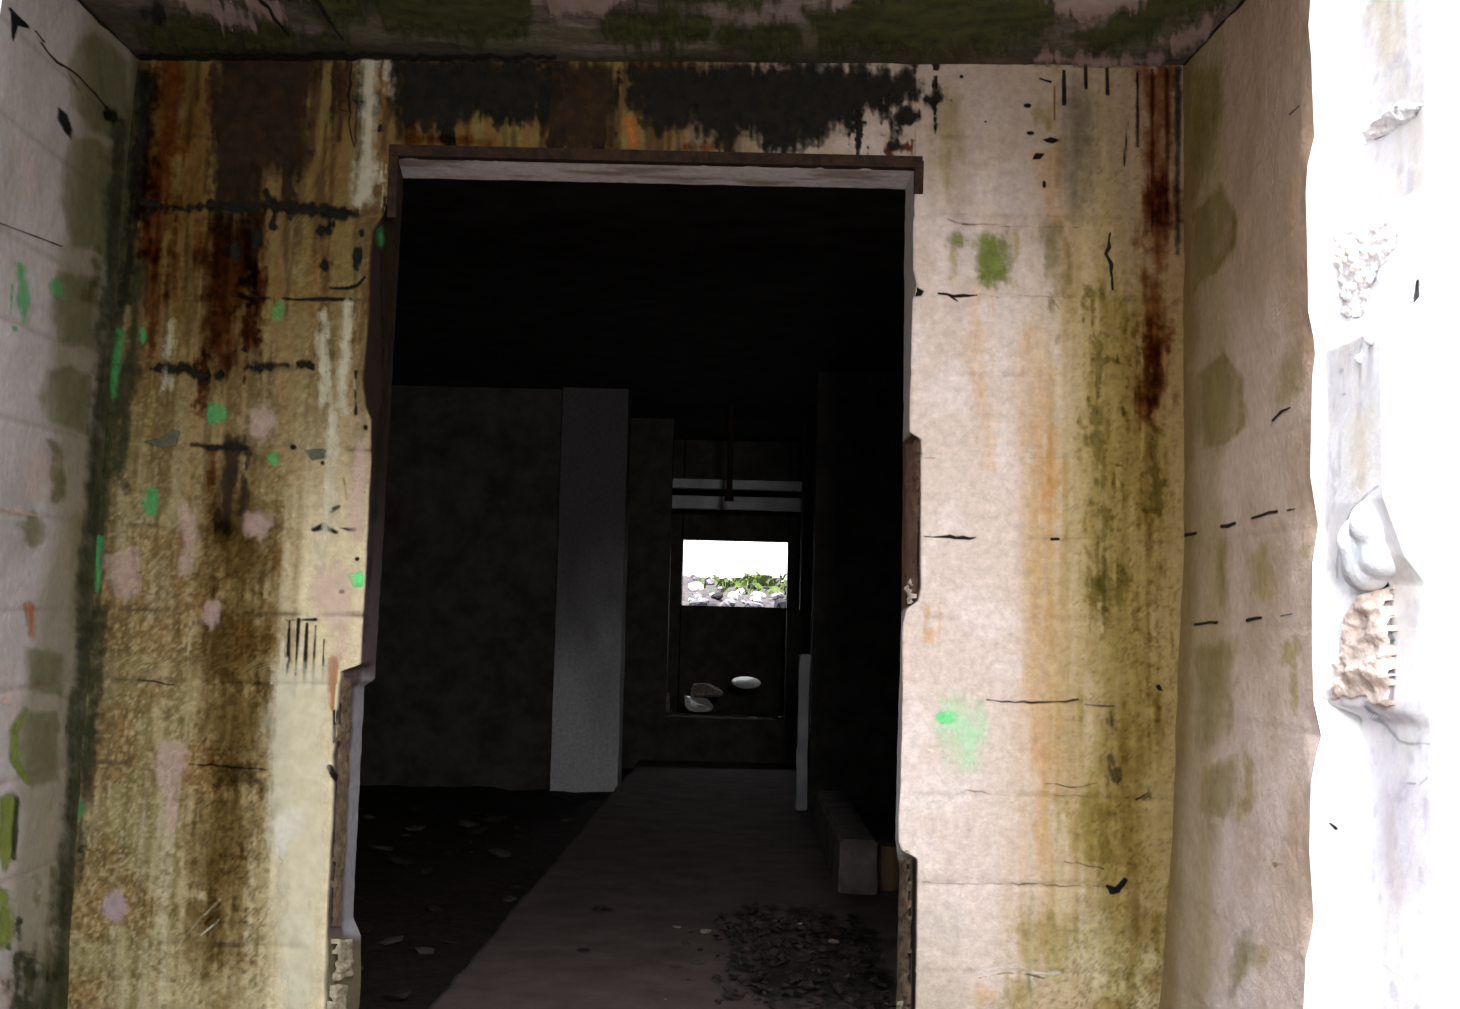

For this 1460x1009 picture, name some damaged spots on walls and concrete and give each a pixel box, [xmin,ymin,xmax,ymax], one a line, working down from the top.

leakage [103,106,119,125]
leakage [1054,70,1066,120]
leakage [208,58,943,286]
leakage [113,71,159,490]
leakage [352,197,397,457]
spalling [1332,214,1399,318]
leakage [212,434,252,533]
leakage [81,606,108,798]
leakage [286,618,325,697]
spalling [1330,585,1398,706]
leakage [1108,755,1121,783]